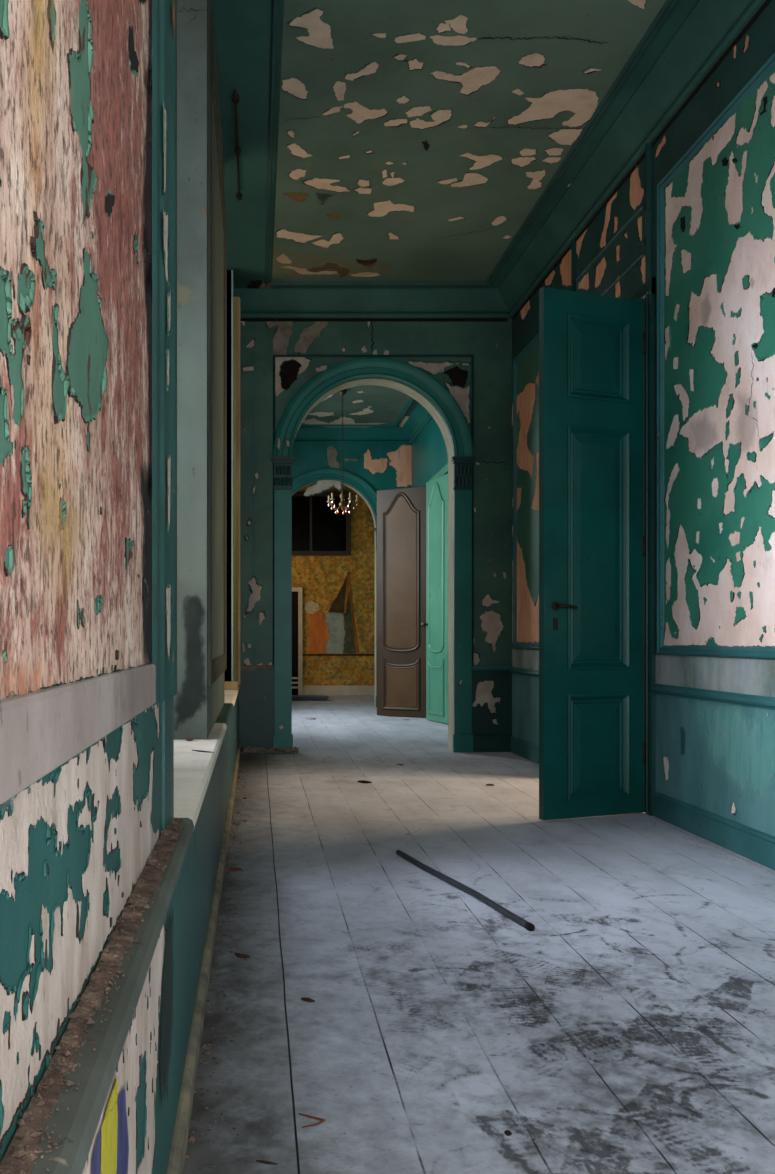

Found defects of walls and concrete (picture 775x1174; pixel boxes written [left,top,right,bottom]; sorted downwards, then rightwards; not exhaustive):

peeling [287,7,336,49]
peeling [284,129,416,217]
peeling [370,15,500,96]
peeling [320,62,601,189]
peeling [545,164,645,298]
peeling [0,0,172,700]
peeling [663,71,775,648]
peeling [304,444,412,497]
peeling [512,371,539,513]
peeling [474,525,539,665]
peeling [0,703,160,1151]
peeling [82,923,167,1174]